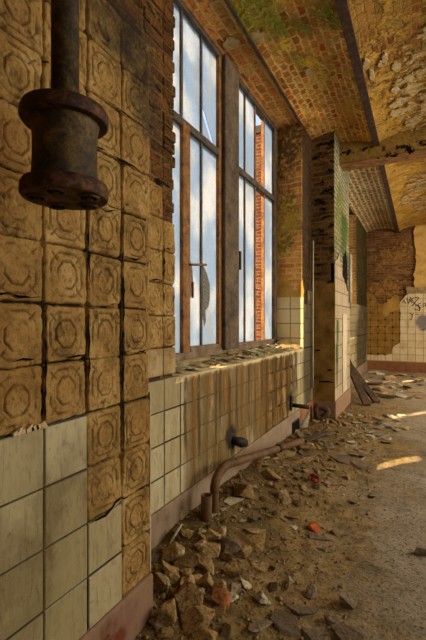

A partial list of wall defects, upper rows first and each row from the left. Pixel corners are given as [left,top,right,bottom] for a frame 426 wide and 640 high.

peeling [363,27,426,131]
crack [0,292,47,421]
crack [67,207,146,523]
spalling [0,0,293,596]
crack [152,230,170,317]
spalling [367,274,410,356]